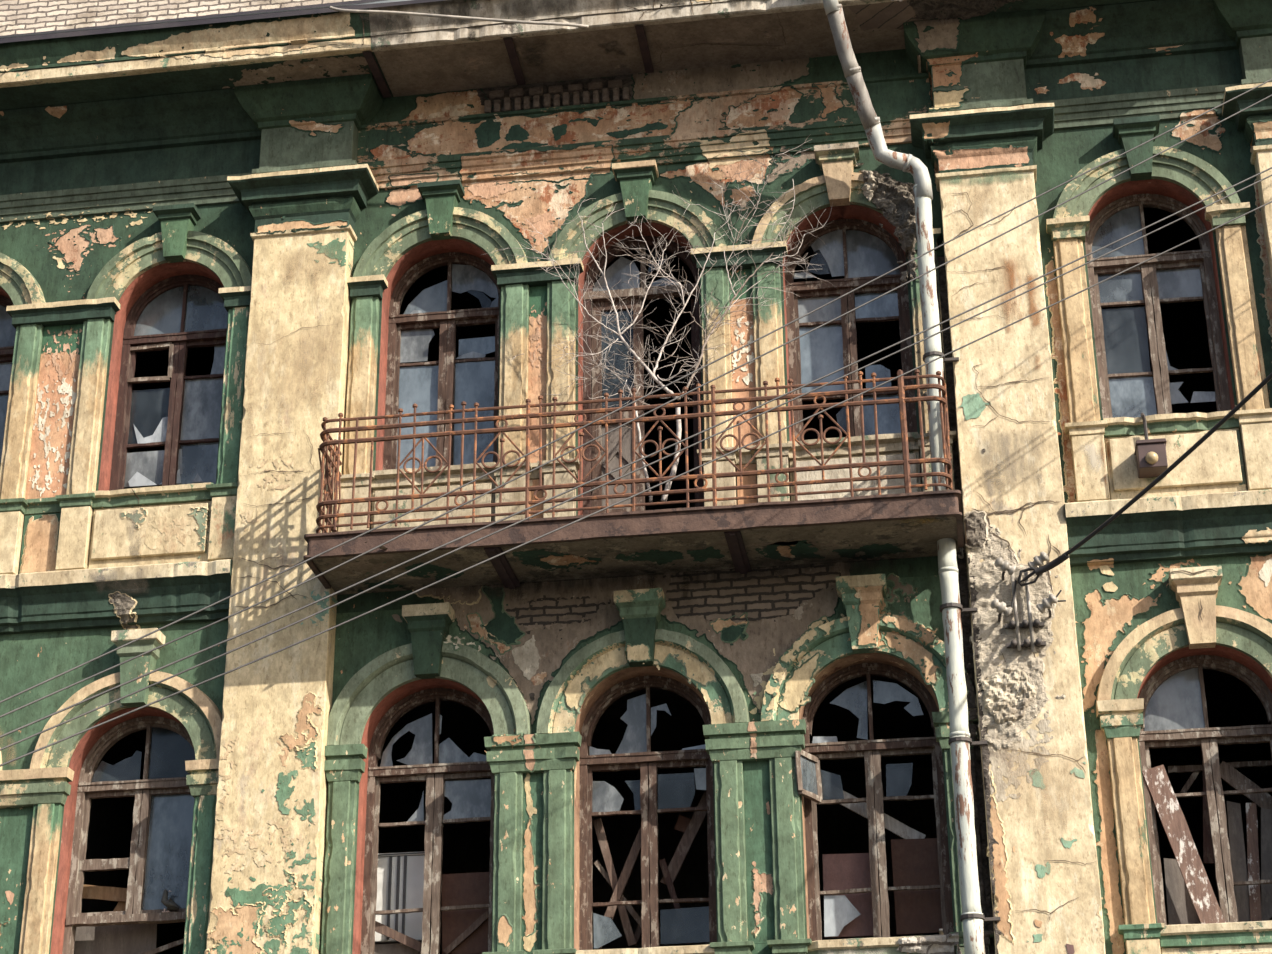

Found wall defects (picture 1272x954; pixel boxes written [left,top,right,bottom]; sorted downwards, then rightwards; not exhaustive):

peeling [0,12,370,88]
peeling [369,57,845,261]
peeling [2,203,155,292]
crack [946,192,1016,238]
crack [947,266,1008,324]
crack [972,364,1050,427]
spalling [934,253,1066,954]
crack [973,492,1061,594]
peeling [1075,558,1201,713]
peeling [1229,527,1272,621]
flaking render [412,535,943,952]
flaking render [897,929,962,954]